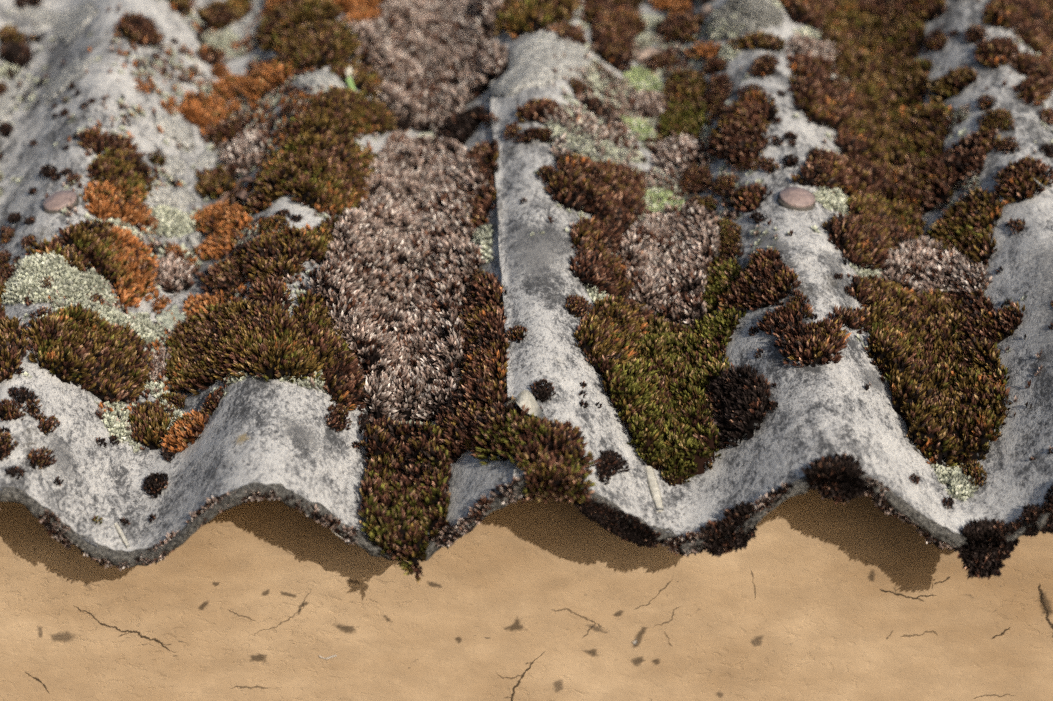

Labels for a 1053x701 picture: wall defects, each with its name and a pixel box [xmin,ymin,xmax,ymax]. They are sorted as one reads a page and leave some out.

crack [73,605,174,653]
crack [1038,585,1053,628]
crack [511,650,546,701]